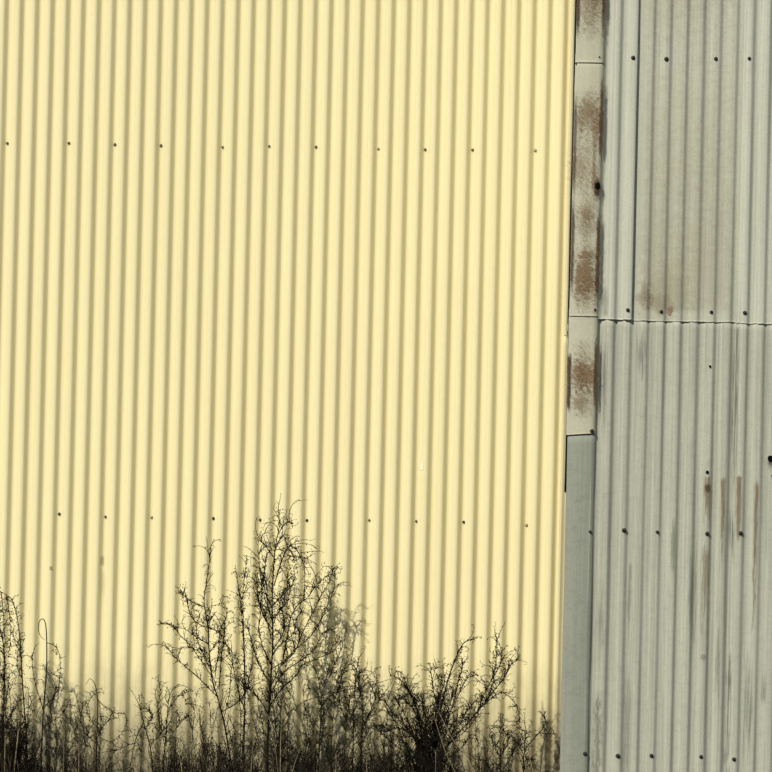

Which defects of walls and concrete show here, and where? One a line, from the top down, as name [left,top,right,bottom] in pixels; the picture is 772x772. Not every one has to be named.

rust [572,78,604,188]
rust [570,207,600,302]
rust [566,341,598,408]